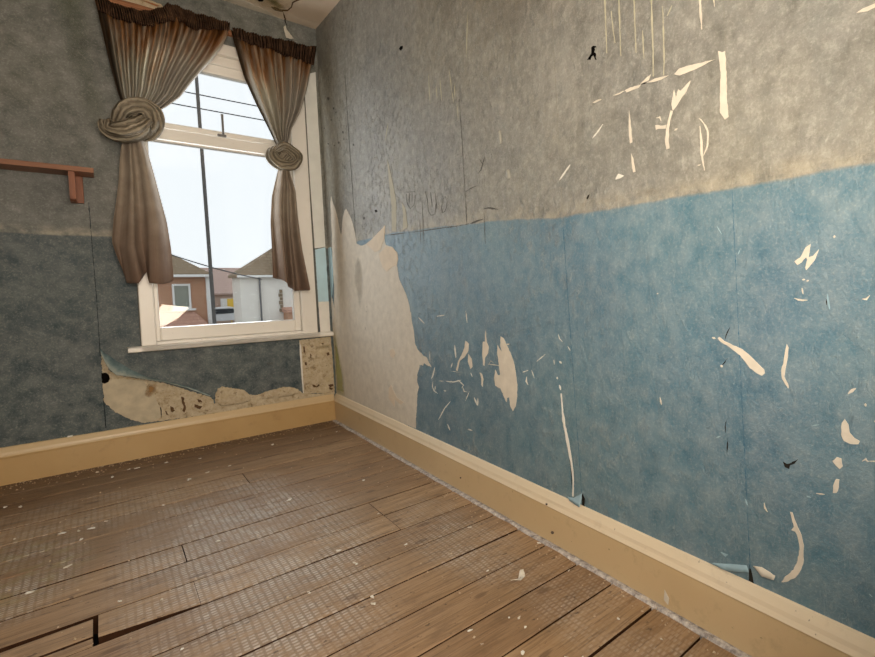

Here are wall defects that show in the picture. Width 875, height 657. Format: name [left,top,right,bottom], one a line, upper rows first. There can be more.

flaking render [124,0,163,9]
flaking render [101,336,335,423]